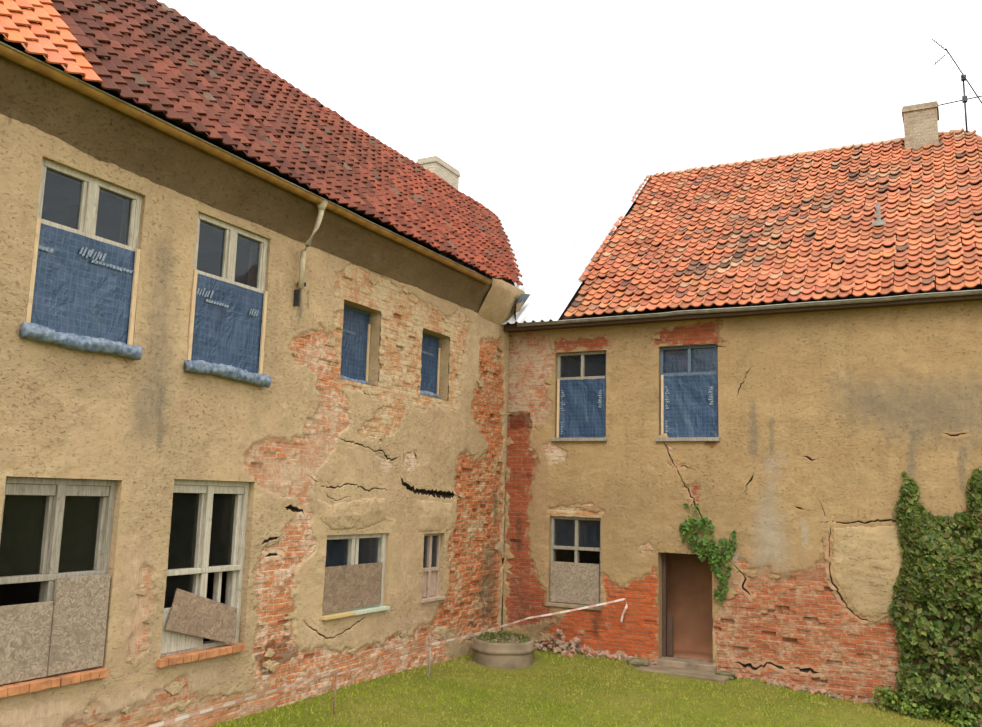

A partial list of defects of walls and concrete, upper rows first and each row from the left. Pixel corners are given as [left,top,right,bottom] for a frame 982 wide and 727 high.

spalling [650,318,730,348]
spalling [62,262,659,727]
crack [659,433,715,534]
crack [738,470,758,499]
crack [726,559,756,603]
spalling [713,535,916,705]